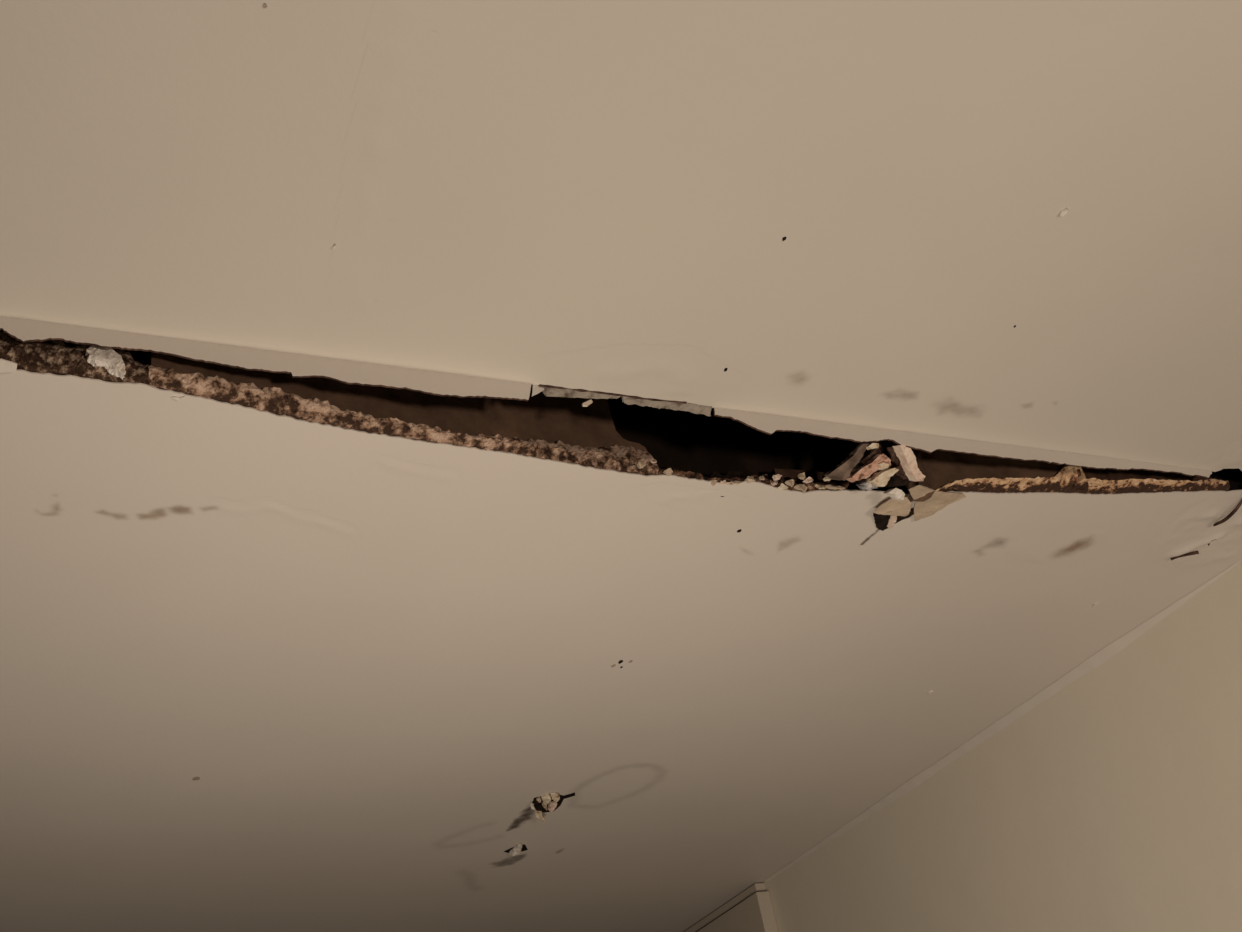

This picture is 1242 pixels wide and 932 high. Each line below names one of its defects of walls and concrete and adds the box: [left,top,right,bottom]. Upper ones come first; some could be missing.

flaking render [0,330,1242,573]
flaking render [509,792,575,830]
flaking render [504,844,528,856]